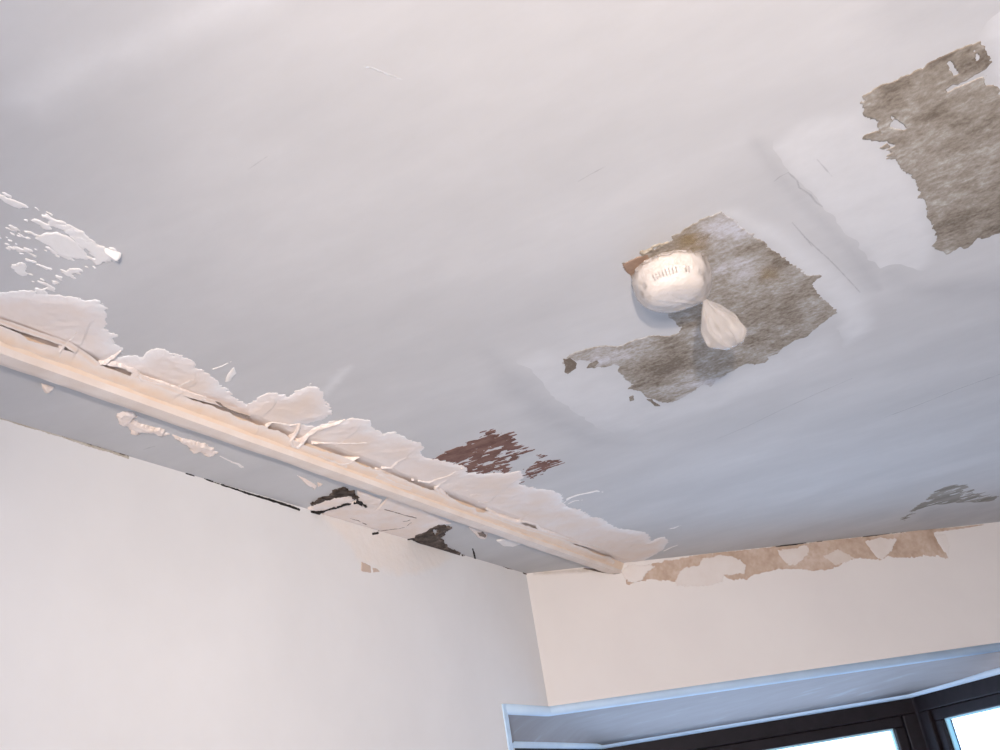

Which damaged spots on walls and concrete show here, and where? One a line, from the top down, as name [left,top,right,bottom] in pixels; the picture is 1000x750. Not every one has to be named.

peeling [860,41,1000,255]
peeling [562,211,837,406]
spalling [0,418,129,459]
peeling [172,435,218,457]
peeling [435,429,565,485]
spalling [308,482,360,511]
damp [909,500,1000,532]
spalling [408,524,465,556]